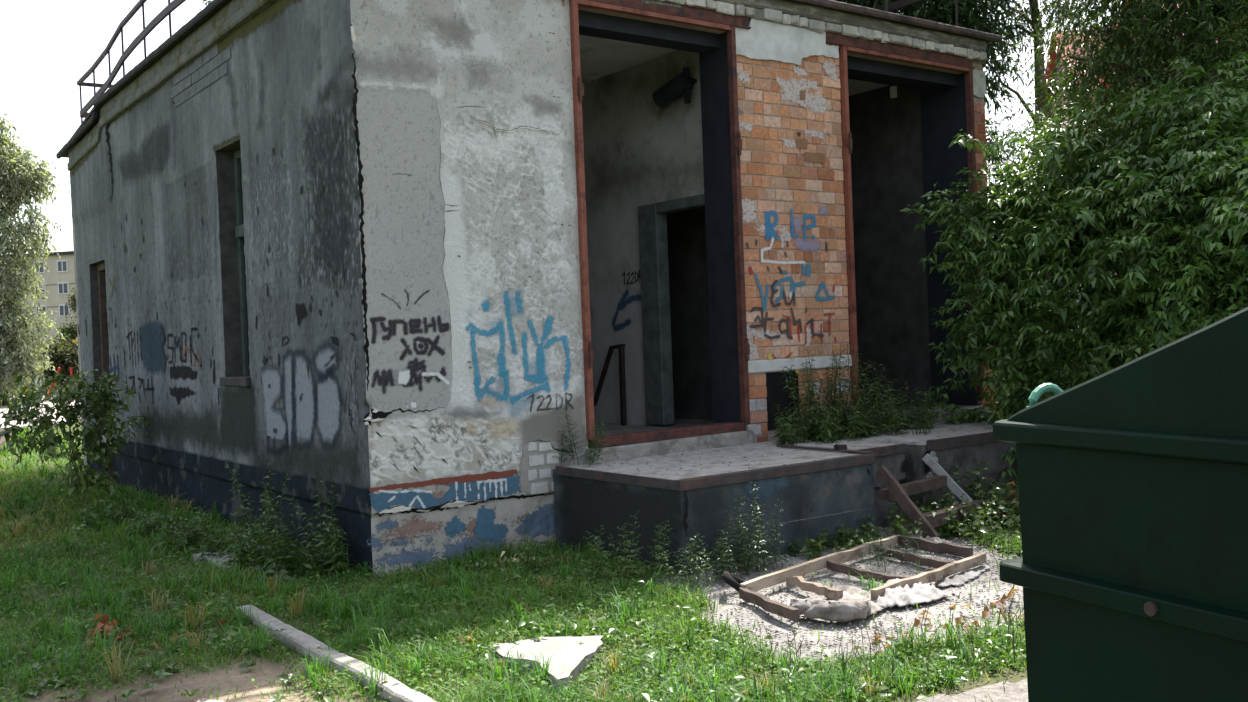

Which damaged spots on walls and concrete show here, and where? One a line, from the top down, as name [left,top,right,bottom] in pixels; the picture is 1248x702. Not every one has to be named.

crack [96,108,131,204]
spalling [797,139,825,163]
peeling [339,338,555,572]